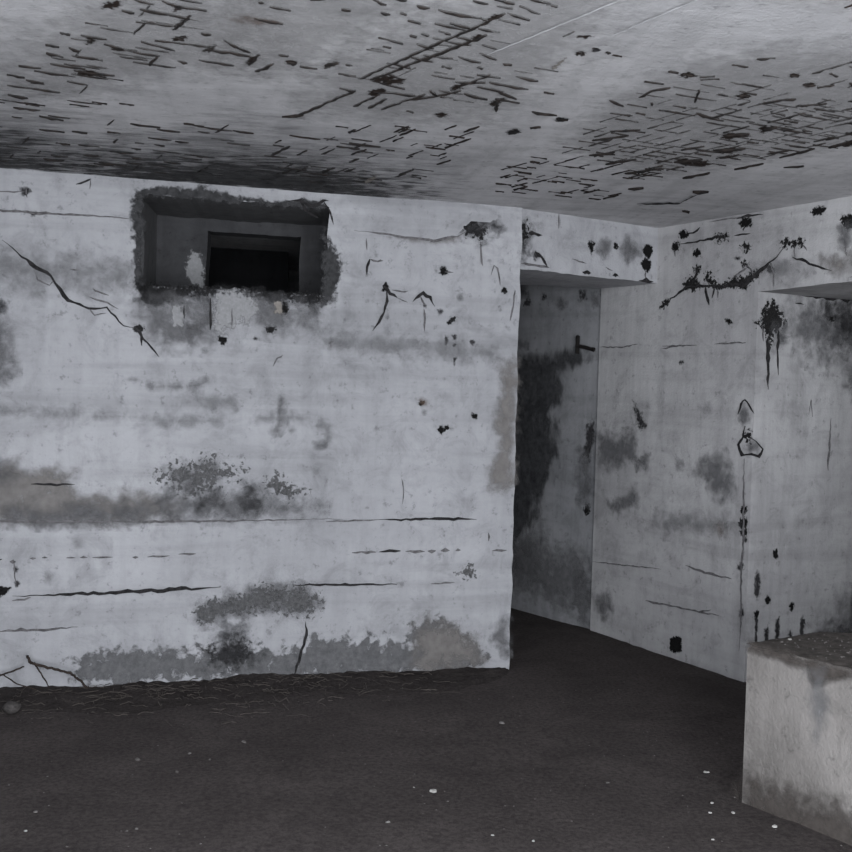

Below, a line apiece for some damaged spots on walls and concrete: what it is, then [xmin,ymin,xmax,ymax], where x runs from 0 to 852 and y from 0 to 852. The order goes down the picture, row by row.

spalling [0,0,569,179]
spalling [257,125,427,184]
spalling [495,70,852,200]
crack [0,188,129,219]
crack [4,241,159,357]
spalling [185,251,205,288]
spalling [172,288,259,335]
crack [659,237,832,310]
damp [0,465,176,526]
damp [491,342,611,623]
crack [0,557,217,601]
damp [68,617,490,684]